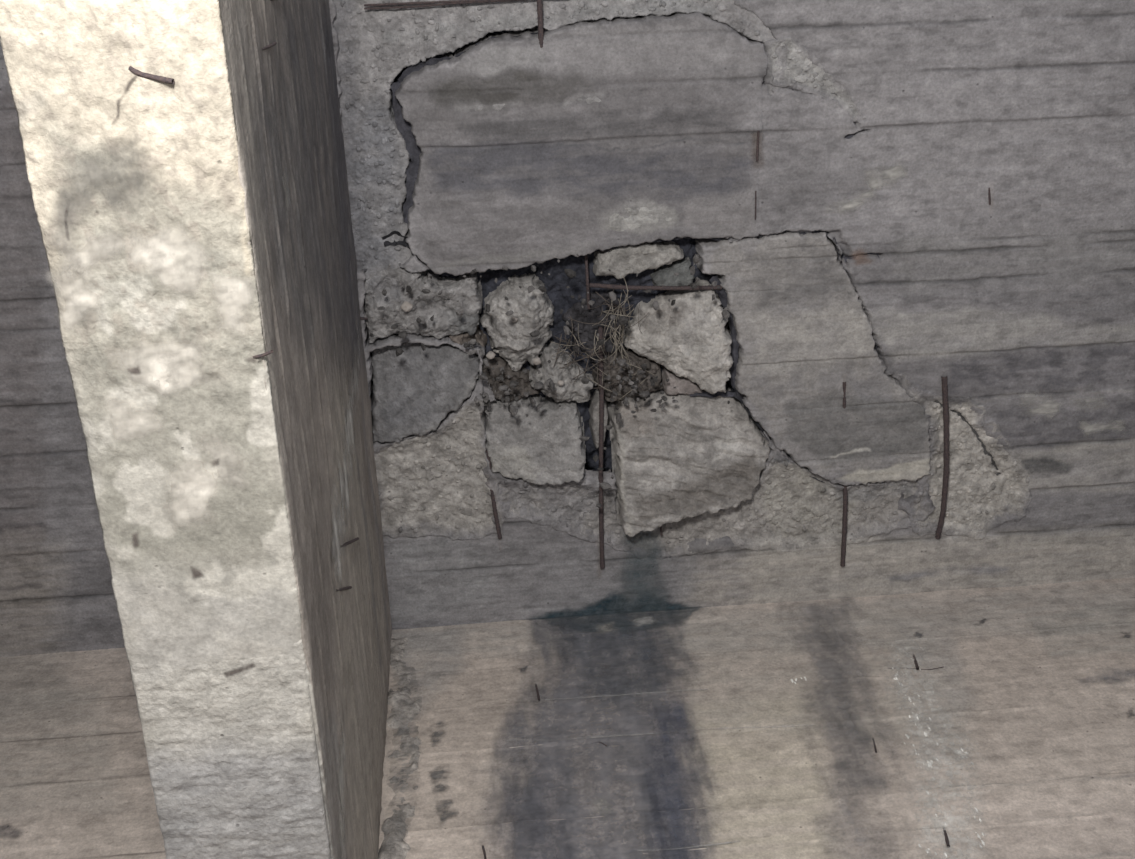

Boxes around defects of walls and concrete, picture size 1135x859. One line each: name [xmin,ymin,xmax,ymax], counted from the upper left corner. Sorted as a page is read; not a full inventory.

crack [381,30,548,249]
peeling [333,0,1033,561]
crack [554,230,879,275]
crack [690,276,824,483]
crack [934,400,1001,476]
water stain [504,533,731,859]